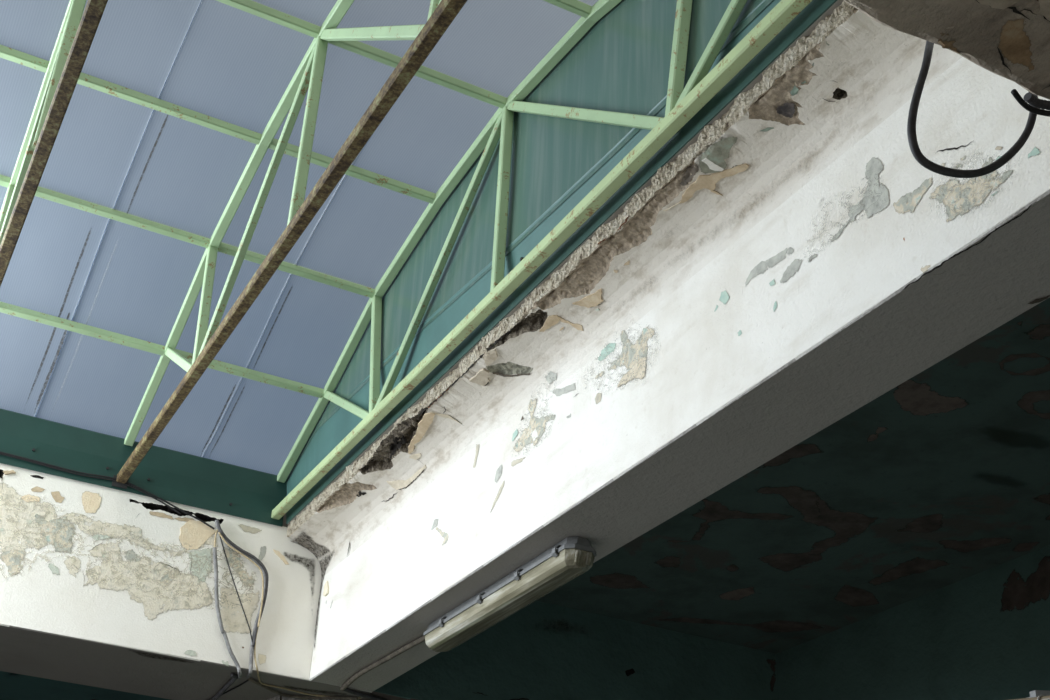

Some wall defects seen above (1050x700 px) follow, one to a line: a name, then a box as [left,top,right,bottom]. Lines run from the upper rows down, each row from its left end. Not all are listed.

spalling [937,26,961,54]
spalling [486,137,749,351]
peeling [745,146,1013,286]
spalling [316,408,435,513]
spalling [469,362,533,386]
peeling [491,326,659,511]
peeling [757,444,824,469]
peeling [0,469,261,634]
peeling [431,519,448,545]
peeling [1000,556,1050,611]